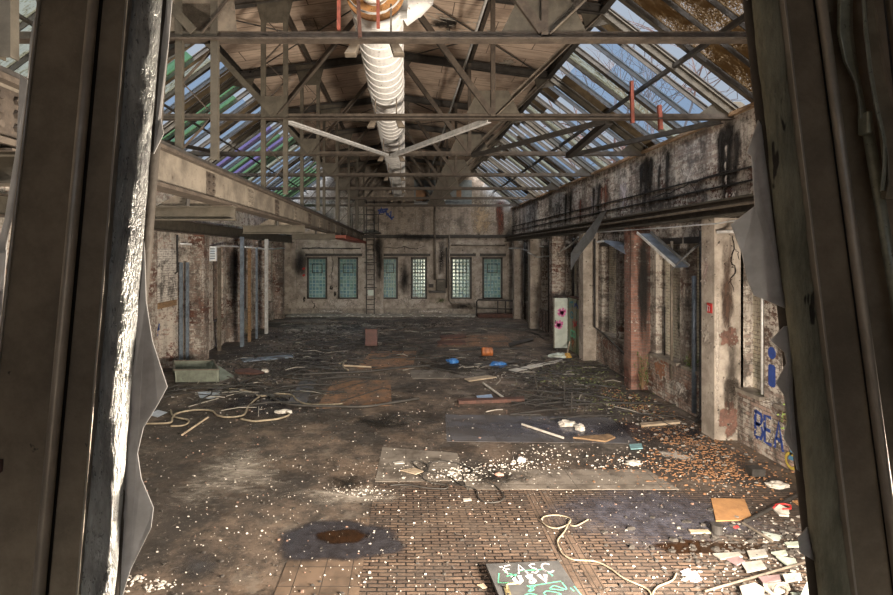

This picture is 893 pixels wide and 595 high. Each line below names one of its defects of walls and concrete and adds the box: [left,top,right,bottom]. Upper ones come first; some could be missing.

water stain [640,151,695,206]
water stain [718,123,740,198]